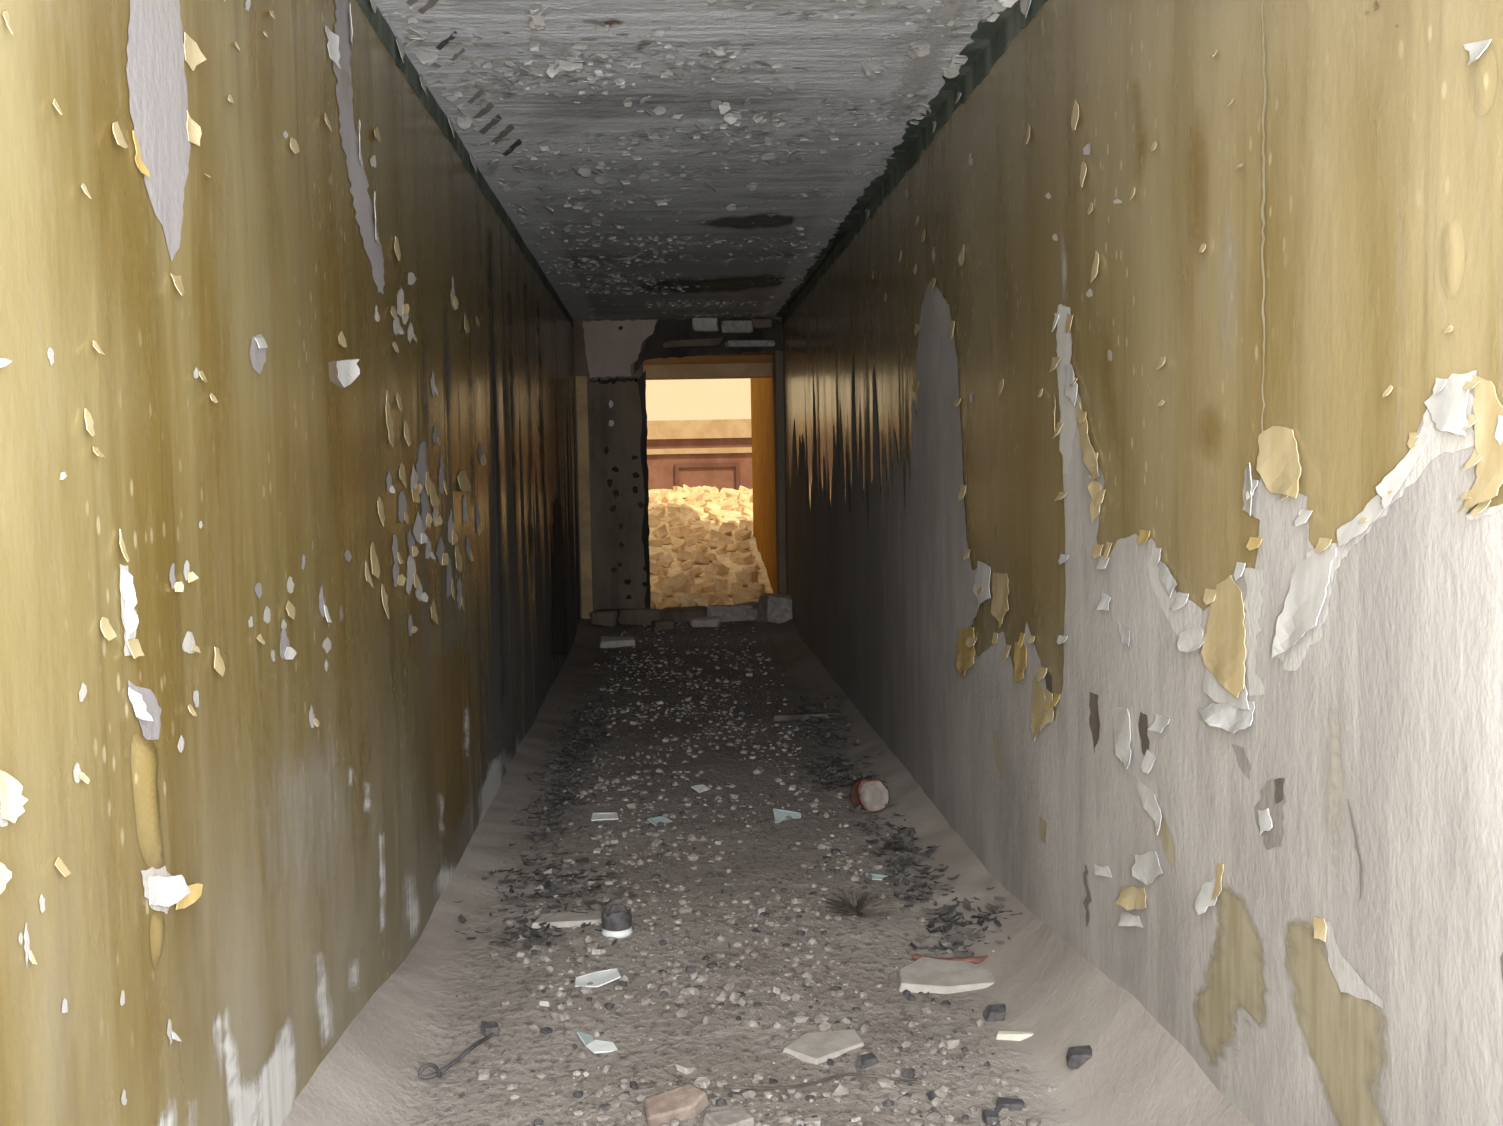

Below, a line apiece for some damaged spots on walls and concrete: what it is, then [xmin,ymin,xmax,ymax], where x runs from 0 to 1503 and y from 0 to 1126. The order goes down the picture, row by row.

peeling [112,0,213,295]
peeling [324,0,418,353]
peeling [370,0,1031,333]
peeling [169,560,199,592]
peeling [182,631,225,676]
peeling [248,554,305,662]
peeling [344,390,486,636]
peeling [785,215,1503,1126]
peeling [0,862,12,894]
peeling [0,770,28,827]
peeling [18,923,37,965]
peeling [128,680,203,969]